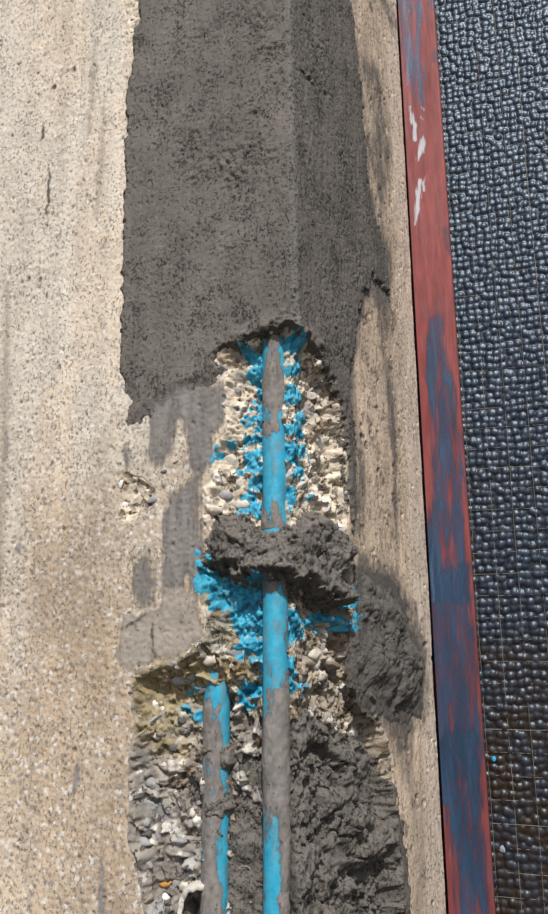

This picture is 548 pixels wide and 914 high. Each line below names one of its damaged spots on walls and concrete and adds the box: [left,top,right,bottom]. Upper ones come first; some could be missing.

spalling [116,472,158,523]
spalling [202,327,349,533]
spalling [127,548,266,914]
spalling [286,569,392,782]